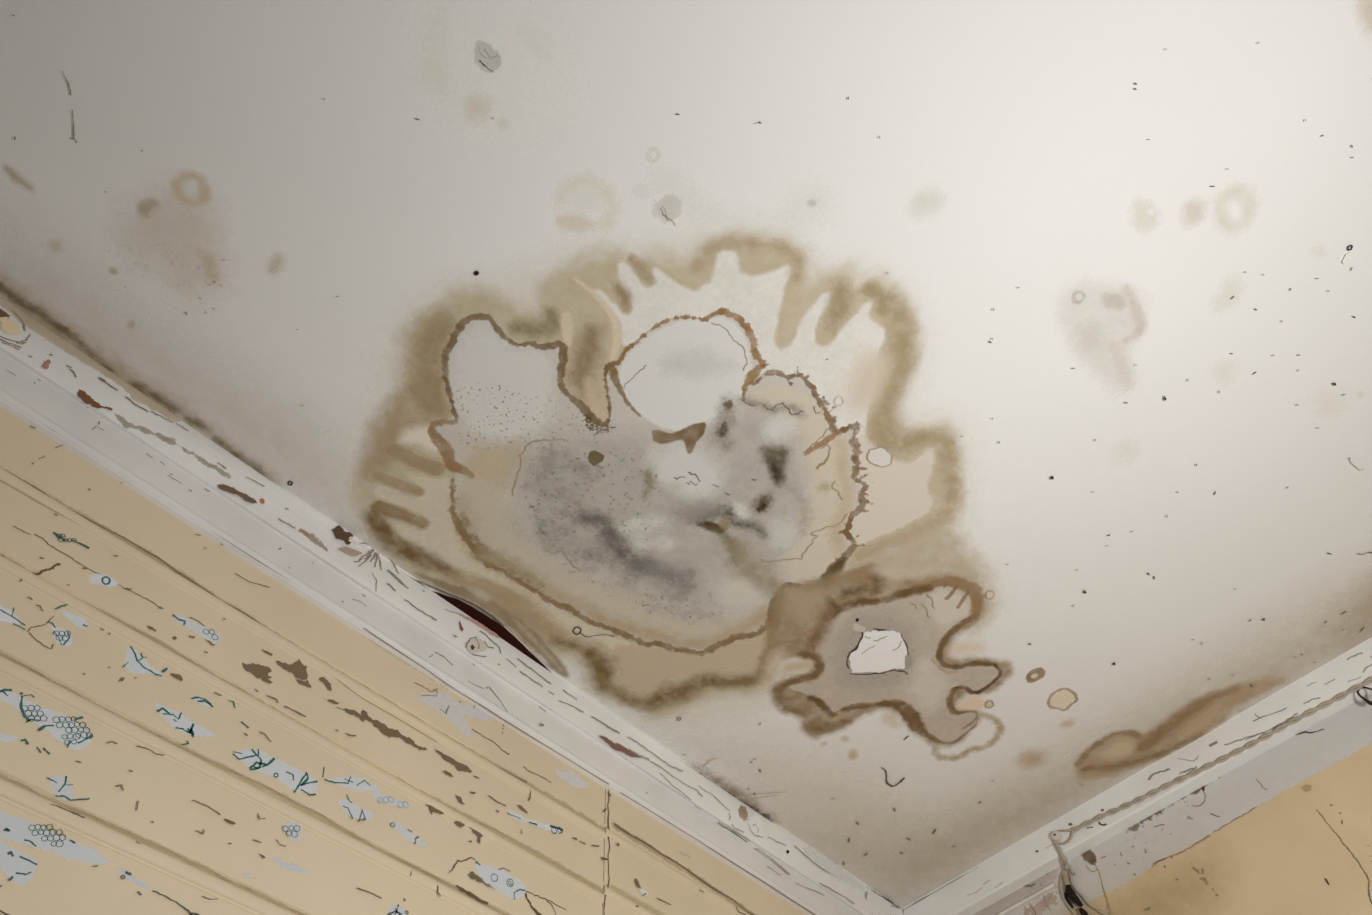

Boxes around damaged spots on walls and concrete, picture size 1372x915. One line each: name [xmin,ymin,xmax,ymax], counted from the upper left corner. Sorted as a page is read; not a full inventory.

water stain [345,147,1045,761]
peeling [119,646,183,681]
spalling [846,623,913,675]
peeling [0,688,93,755]
peeling [155,702,216,745]
peeling [243,649,479,778]
water stain [1047,688,1078,728]
water stain [1075,676,1285,779]
peeling [233,749,483,847]
peeling [0,811,150,895]
peeling [456,861,526,905]
crack [1316,809,1372,903]